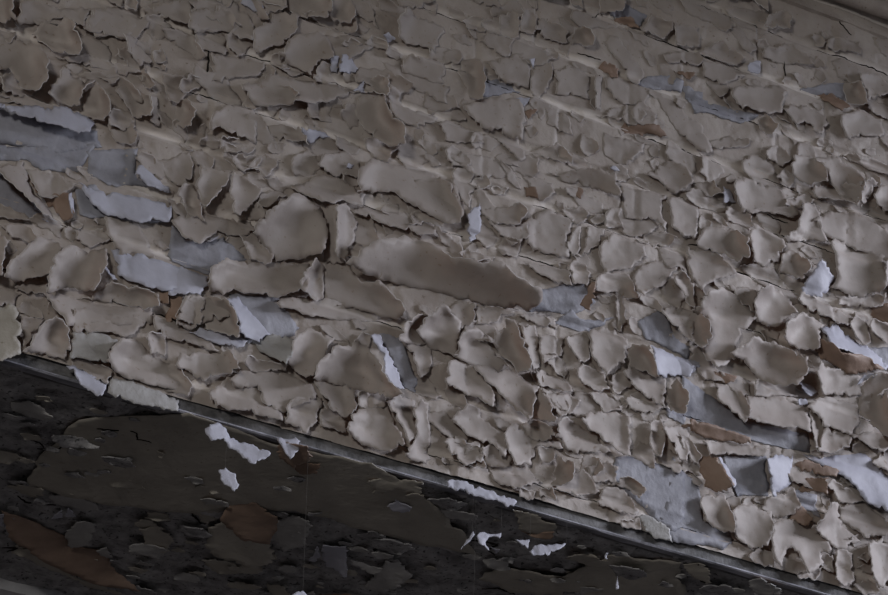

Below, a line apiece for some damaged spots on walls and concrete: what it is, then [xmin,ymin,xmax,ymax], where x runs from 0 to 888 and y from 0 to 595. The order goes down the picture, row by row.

peeling [0,0,649,265]
peeling [641,15,701,48]
crack [644,34,738,70]
peeling [680,0,888,147]
crack [817,50,888,76]
peeling [0,107,697,468]
peeling [446,34,888,595]
peeling [0,408,745,595]